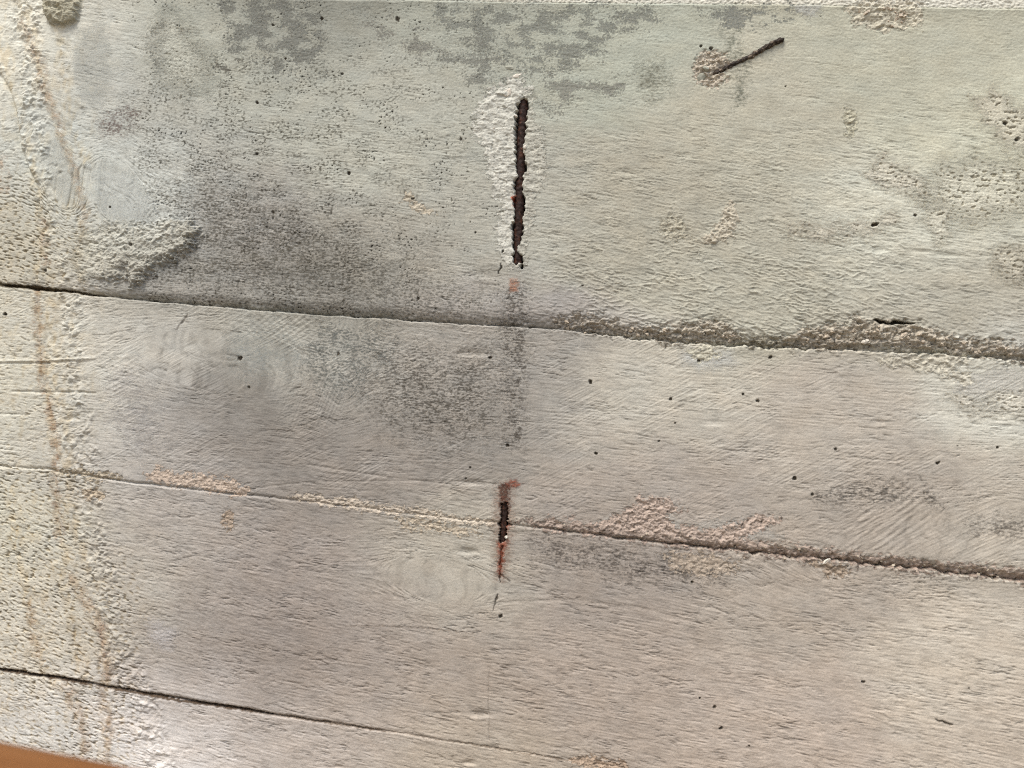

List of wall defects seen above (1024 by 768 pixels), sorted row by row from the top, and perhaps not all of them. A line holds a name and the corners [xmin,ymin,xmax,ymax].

spalling [691,37,785,90]
spalling [352,0,662,272]
rust [498,480,520,514]
spalling [287,491,1024,587]